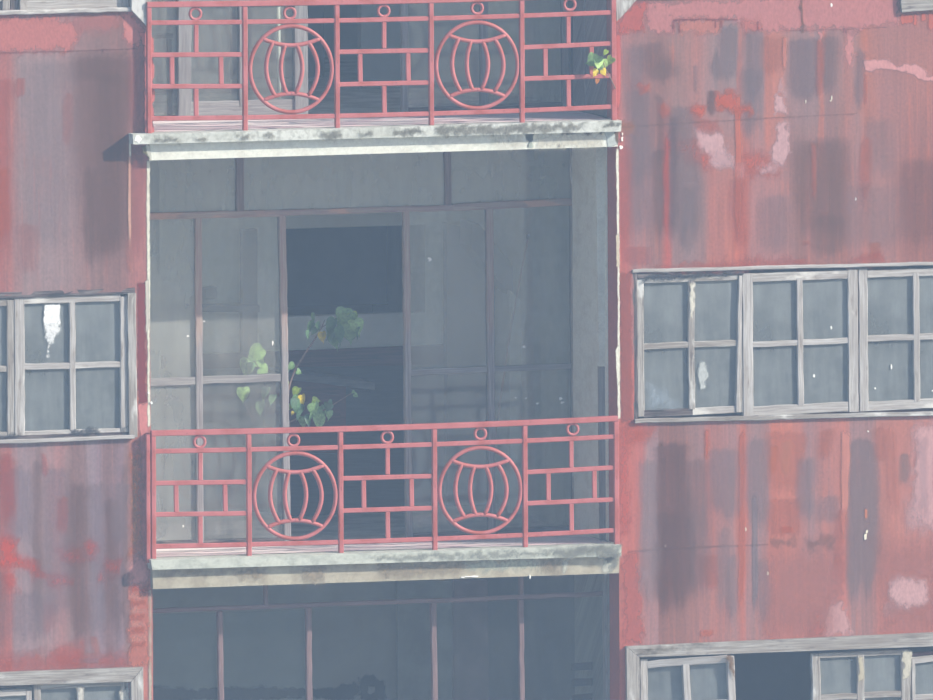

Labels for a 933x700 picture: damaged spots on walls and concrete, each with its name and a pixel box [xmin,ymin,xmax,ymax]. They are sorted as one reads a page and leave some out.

peeling [616,0,898,66]
peeling [863,59,933,81]
water stain [436,121,621,147]
peeling [695,128,735,167]
peeling [762,95,790,173]
water stain [239,567,263,579]
water stain [378,536,621,578]
peeling [887,577,928,611]
water stain [890,552,933,623]
water stain [0,653,124,671]